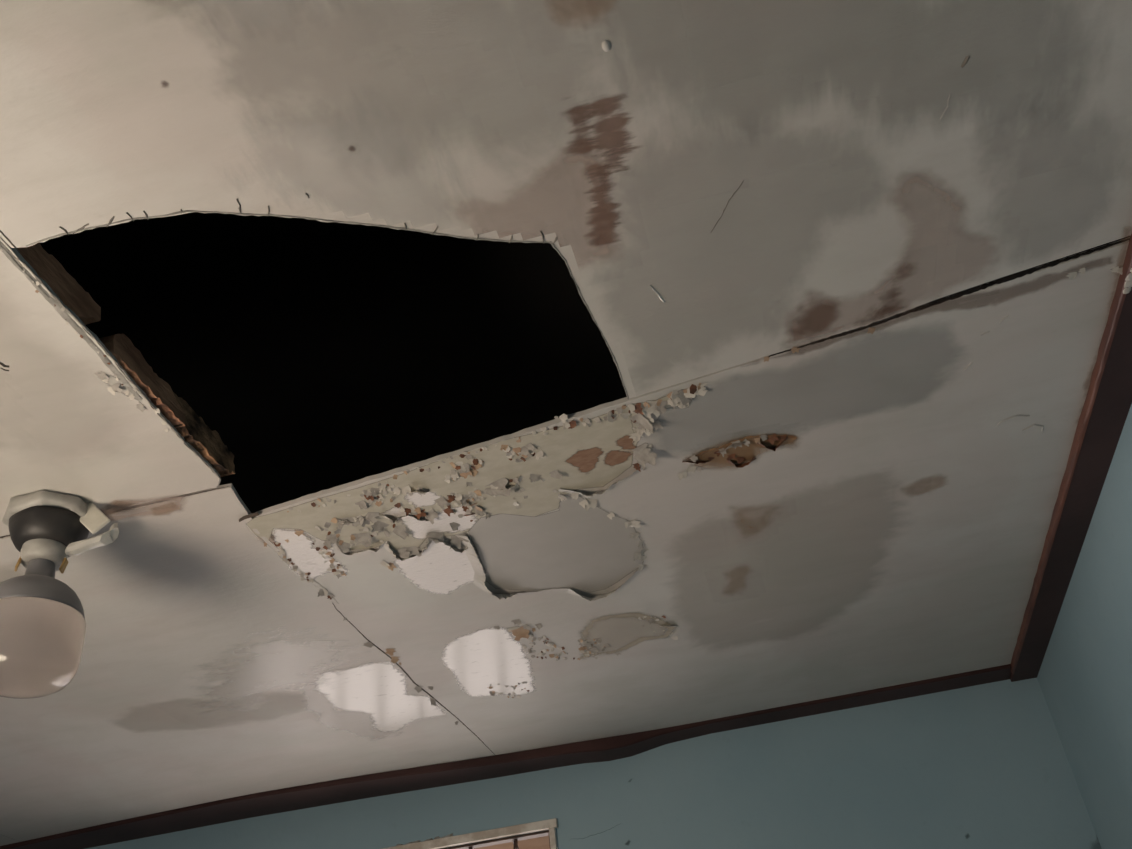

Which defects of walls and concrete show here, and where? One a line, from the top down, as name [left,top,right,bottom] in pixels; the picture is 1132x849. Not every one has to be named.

rust [567,97,630,254]
rust [793,304,837,336]
peeling [16,258,169,432]
peeling [677,433,797,480]
peeling [247,383,708,601]
peeling [494,619,575,661]
peeling [489,681,530,698]